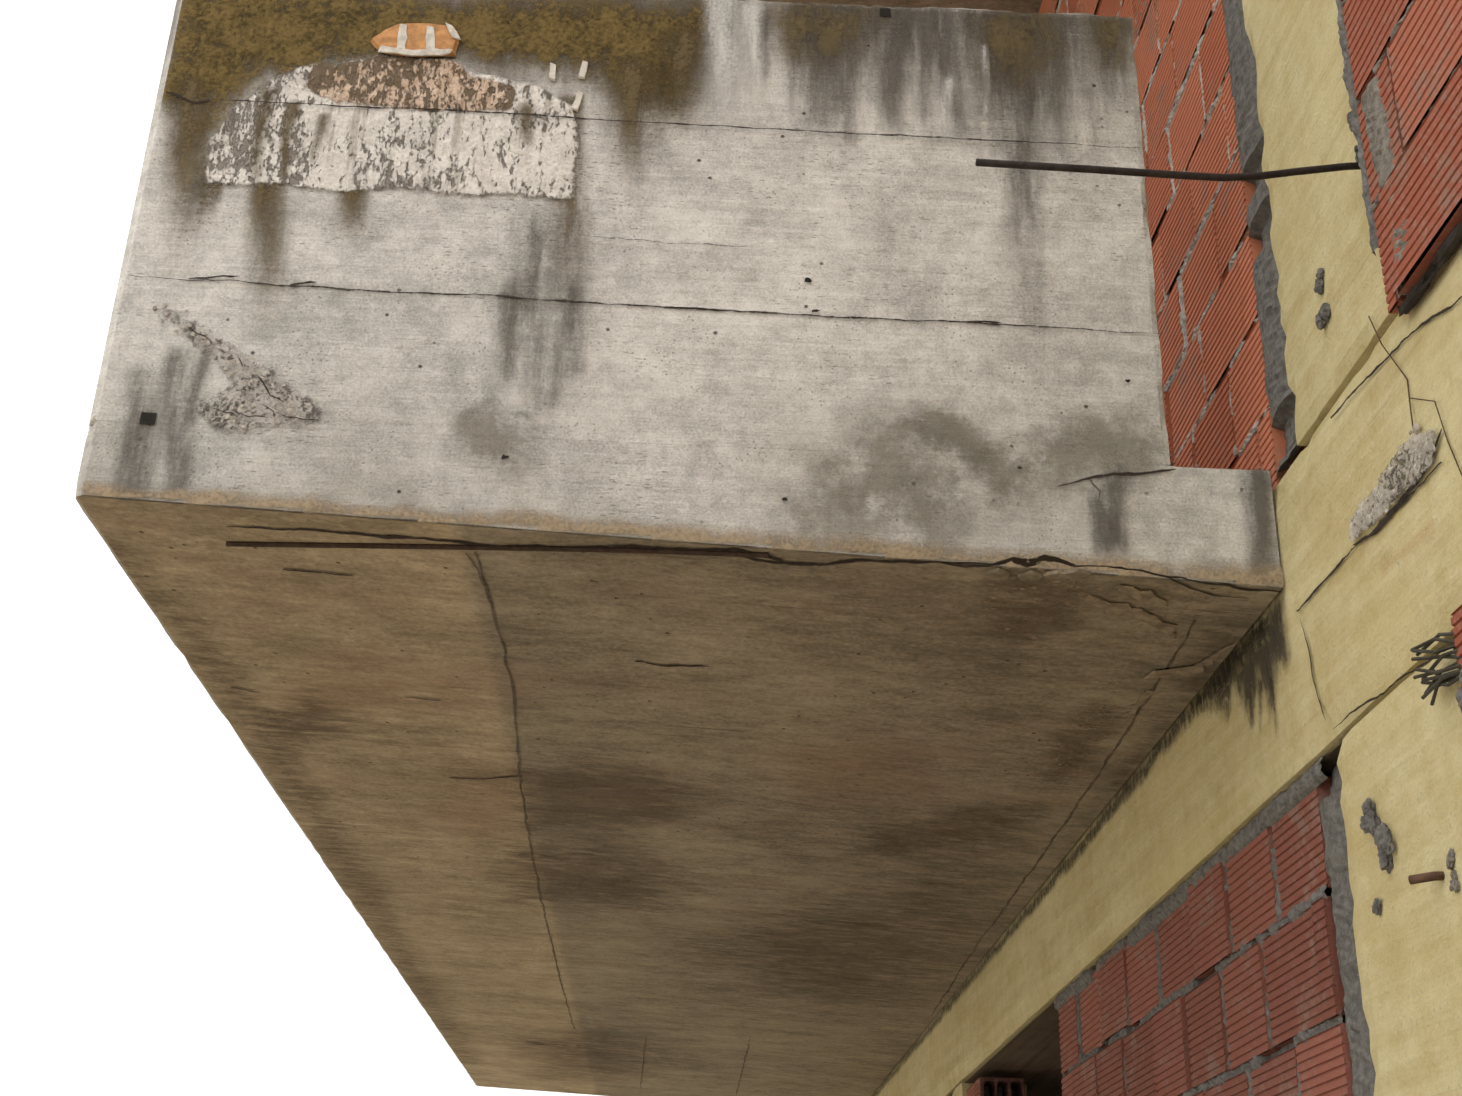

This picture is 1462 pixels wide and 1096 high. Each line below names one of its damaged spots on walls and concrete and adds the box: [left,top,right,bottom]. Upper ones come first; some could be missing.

spalling [206,22,588,200]
damp [612,0,766,151]
damp [789,2,1132,224]
damp [502,221,542,368]
crack [132,275,1160,334]
damp [823,413,1029,524]
damp [1041,423,1150,549]
spalling [1349,423,1442,545]
crack [228,526,996,1029]
crack [933,462,1454,1013]